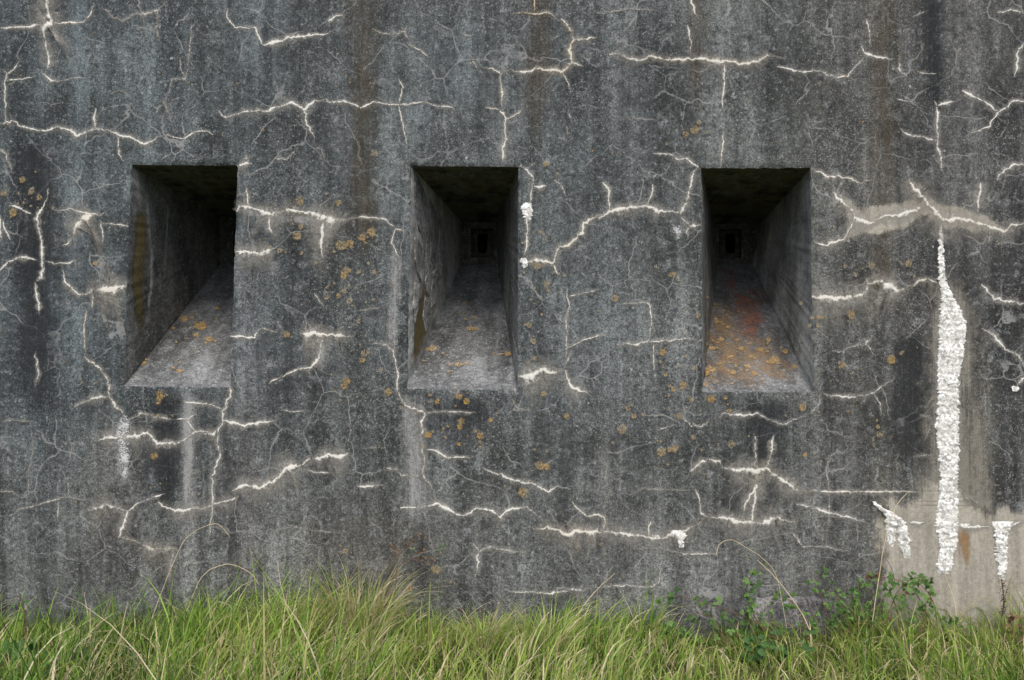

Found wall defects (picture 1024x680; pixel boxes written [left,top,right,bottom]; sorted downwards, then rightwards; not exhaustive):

crack [0,0,454,268]
crack [0,188,936,596]
water stain [670,530,687,548]
crack [465,0,1024,411]
water stain [843,198,1024,641]
crack [959,496,1024,531]